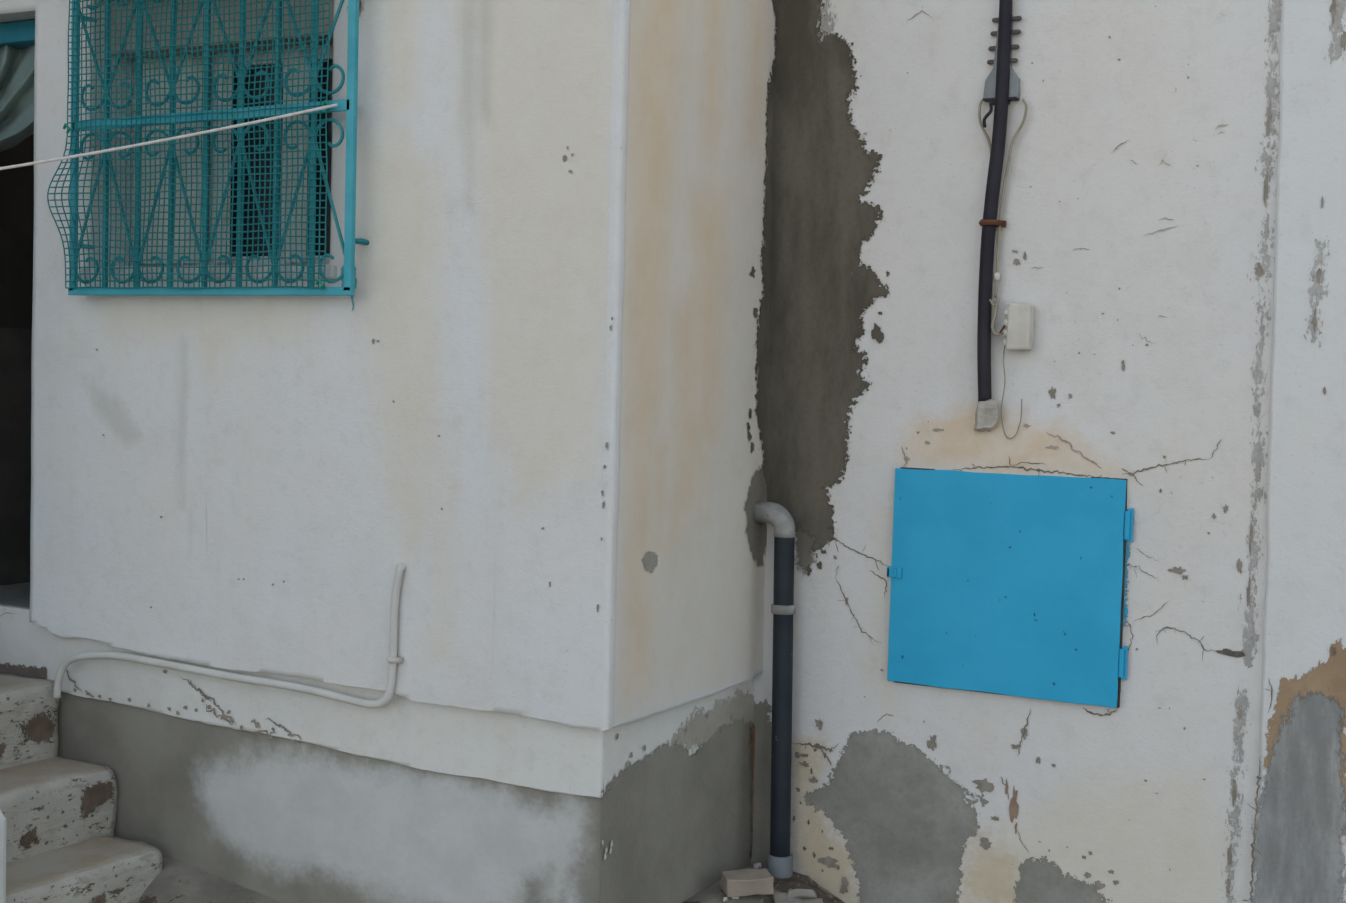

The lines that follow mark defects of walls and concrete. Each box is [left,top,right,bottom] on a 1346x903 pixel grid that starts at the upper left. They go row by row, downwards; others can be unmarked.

peeling [862,312,884,355]
peeling [1236,0,1282,668]
peeling [1304,239,1330,348]
crack [955,440,1221,486]
crack [824,529,887,644]
crack [1125,548,1245,661]
peeling [0,701,57,758]
peeling [8,780,114,850]
peeling [600,688,772,903]
flaking render [793,721,1019,903]
crack [1084,708,1116,717]
peeling [1219,639,1346,903]